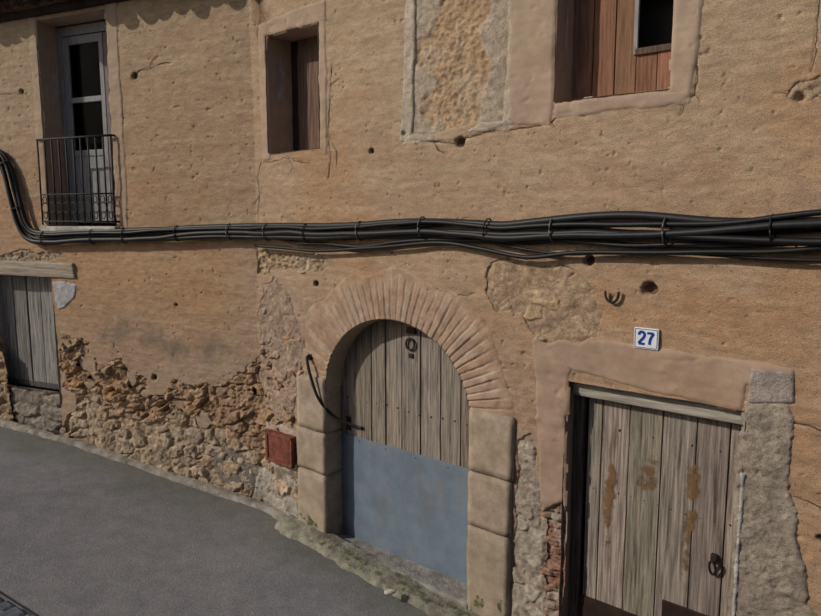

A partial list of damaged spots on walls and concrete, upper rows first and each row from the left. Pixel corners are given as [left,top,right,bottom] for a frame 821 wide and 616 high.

flaking render [399,0,513,145]
crack [812,0,820,66]
flaking render [537,503,567,616]